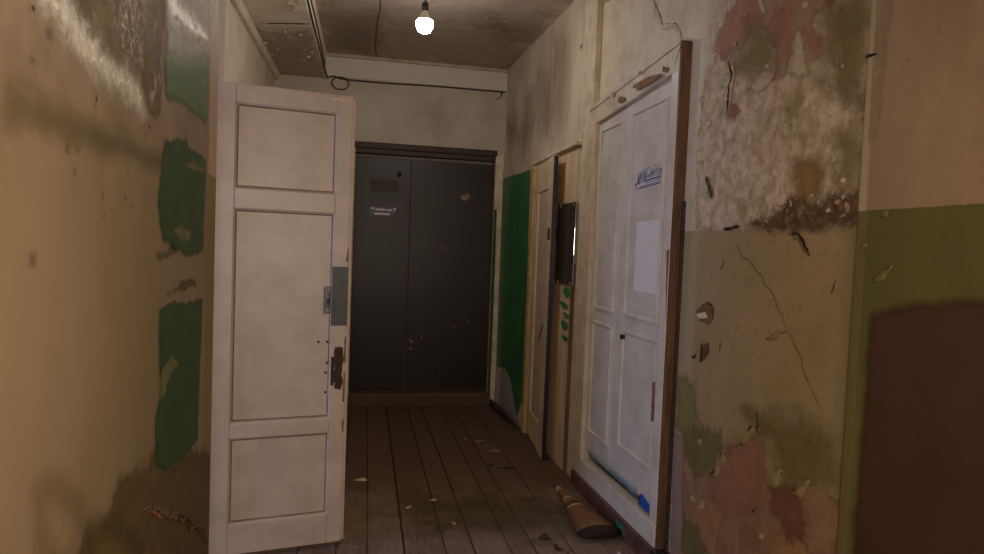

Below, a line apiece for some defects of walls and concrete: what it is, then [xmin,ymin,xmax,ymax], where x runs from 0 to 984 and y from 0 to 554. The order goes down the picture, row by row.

crack [651,0,681,64]
spalling [695,0,864,233]
peeling [691,342,709,363]
peeling [696,302,714,324]
crack [720,225,824,414]
peeling [682,410,839,554]